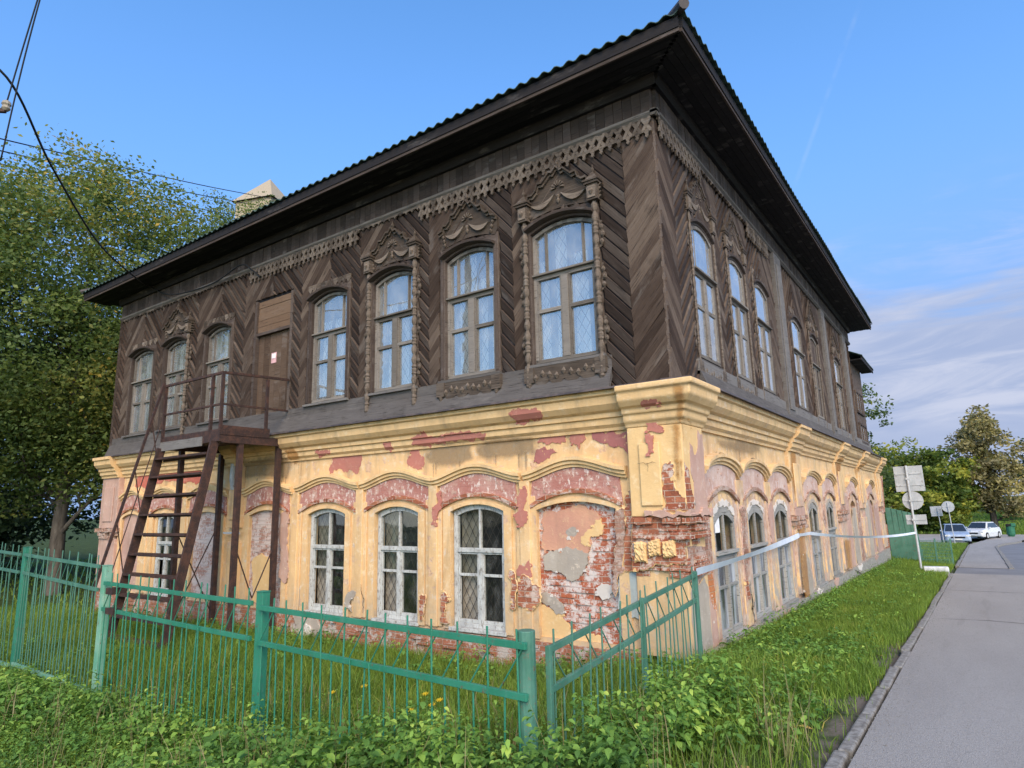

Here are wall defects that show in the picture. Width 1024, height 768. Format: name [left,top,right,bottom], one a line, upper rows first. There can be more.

peeling [508,407,543,426]
peeling [644,422,665,457]
flaking render [246,429,804,658]
peeling [802,468,891,572]